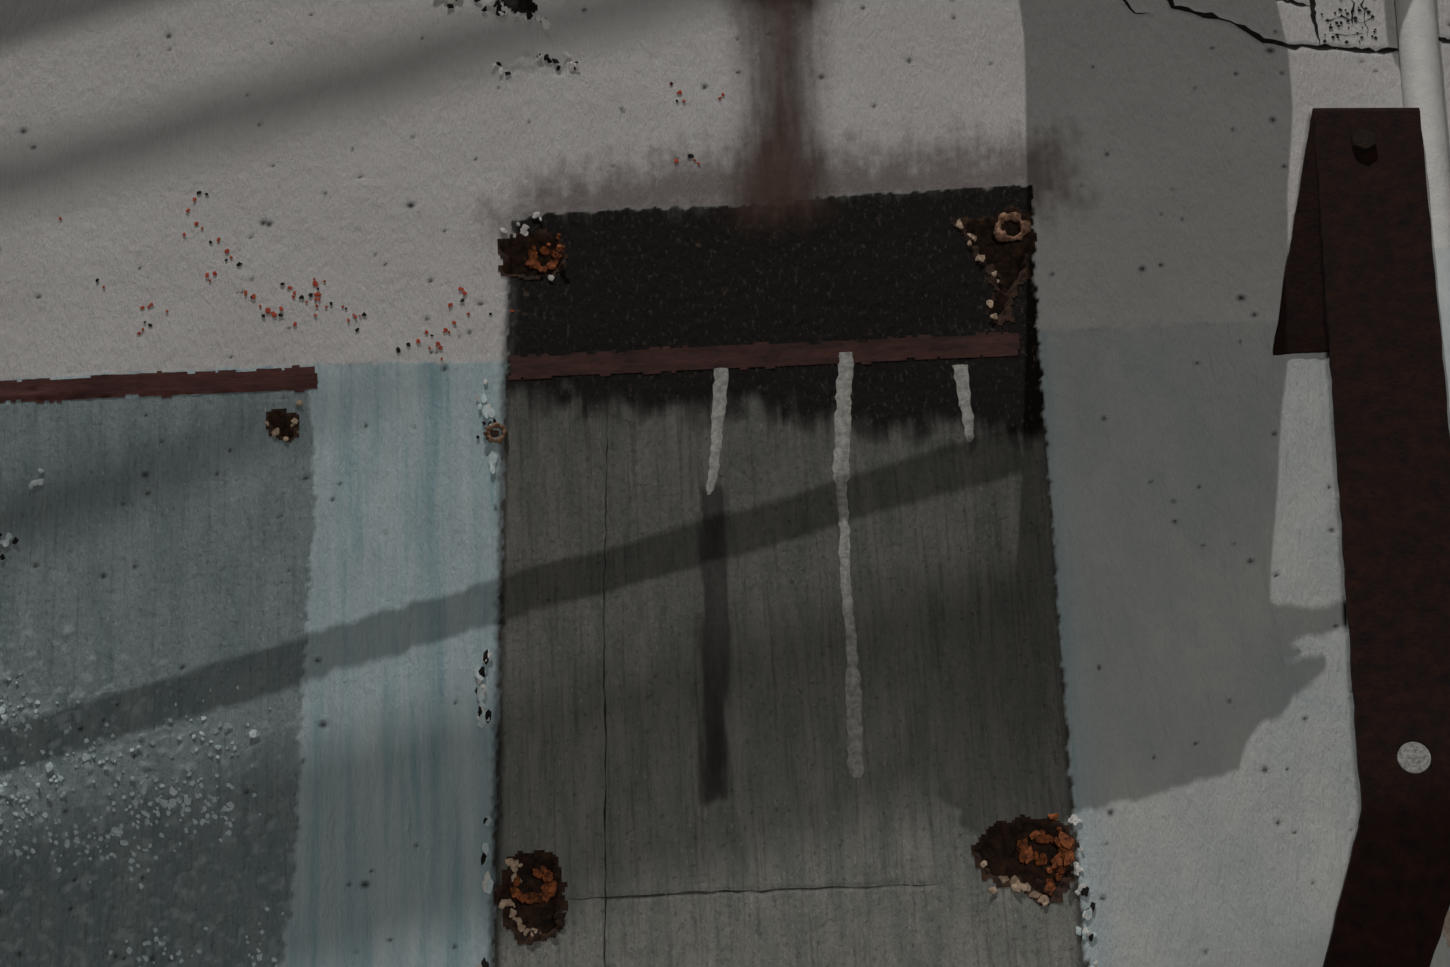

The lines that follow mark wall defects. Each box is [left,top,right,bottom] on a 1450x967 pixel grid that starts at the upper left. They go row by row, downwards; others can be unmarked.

spalling [447,0,550,30]
peeling [536,51,580,71]
crack [1123,0,1398,54]
crack [1438,36,1450,44]
corrosion [743,0,816,219]
peeling [500,212,566,281]
peeling [956,219,1000,284]
peeling [475,379,497,439]
water stain [700,487,729,803]
peeling [473,649,492,729]
peeling [481,814,566,945]
peeling [980,813,1097,942]